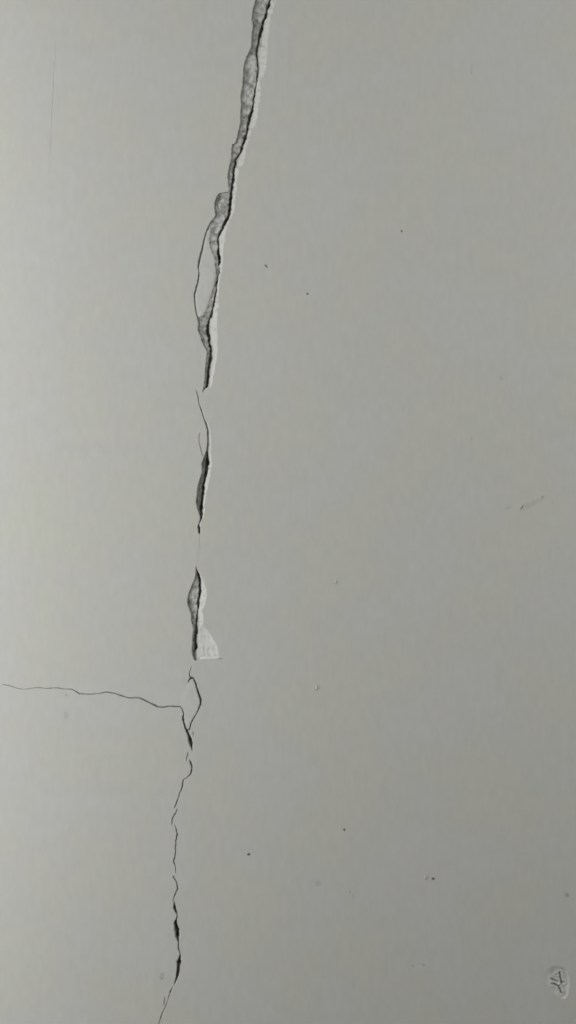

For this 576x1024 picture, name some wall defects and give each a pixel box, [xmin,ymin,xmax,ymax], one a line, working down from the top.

crack [3,0,276,1024]
peeling [198,626,221,659]